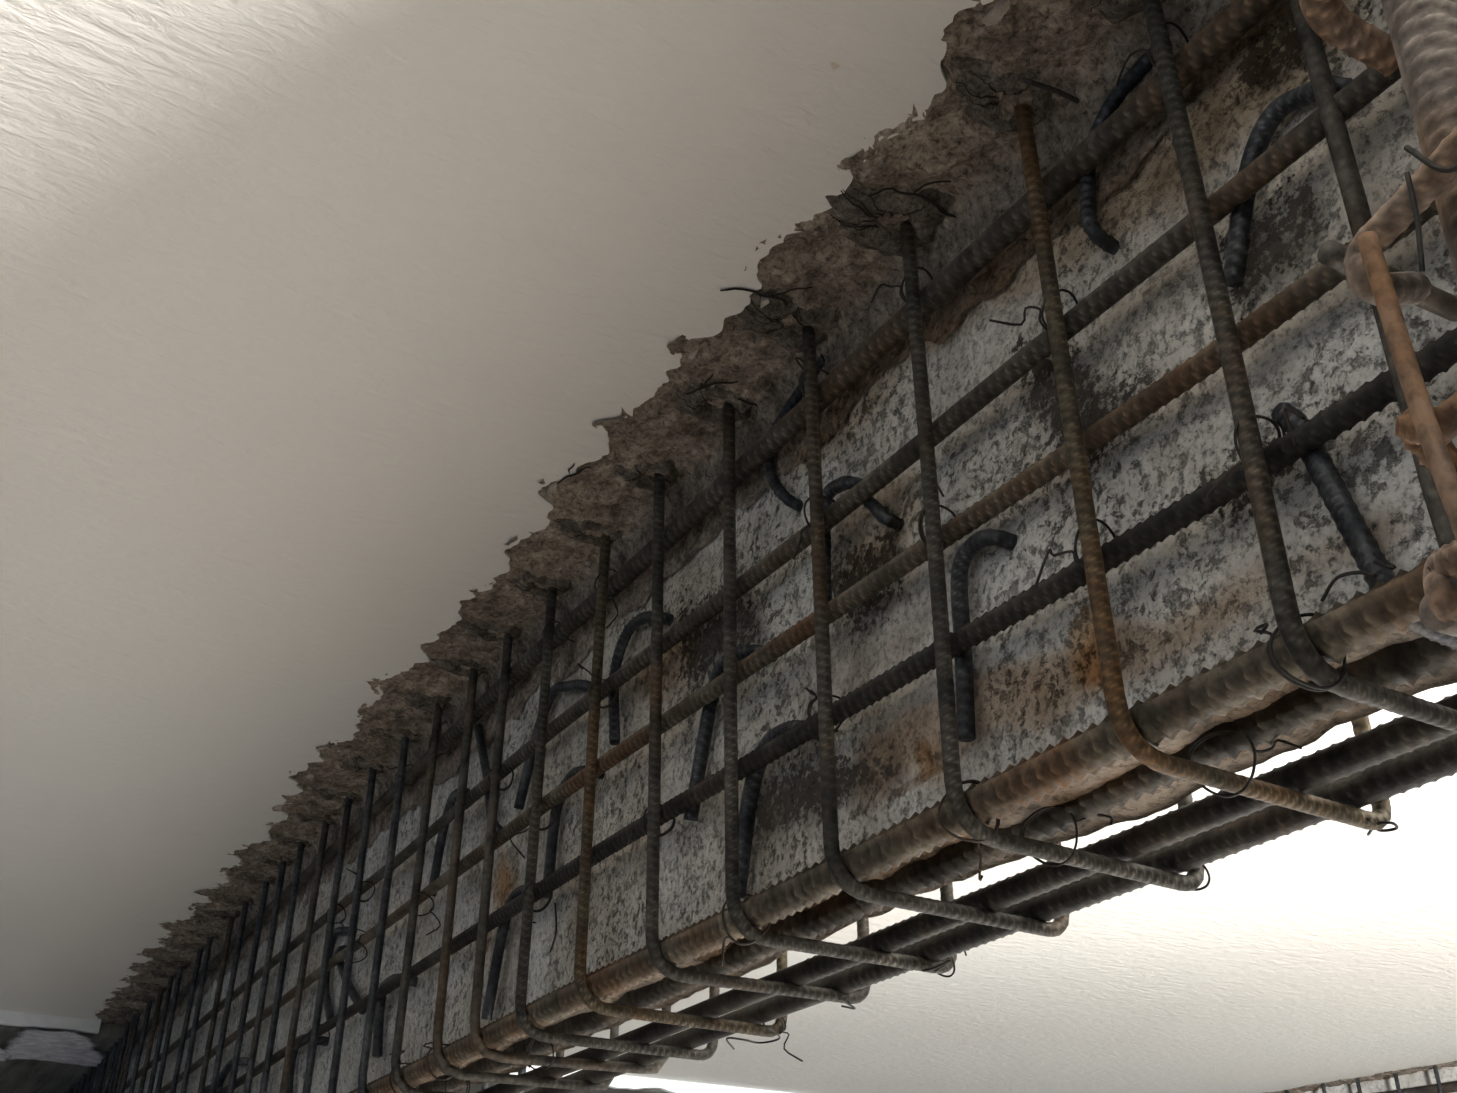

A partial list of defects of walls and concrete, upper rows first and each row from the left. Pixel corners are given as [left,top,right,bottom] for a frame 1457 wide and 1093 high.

peeling [982,0,1010,26]
spalling [1220,10,1304,117]
spalling [1228,165,1321,322]
spalling [996,333,1031,354]
spalling [1017,345,1155,449]
spalling [831,504,902,599]
spalling [1194,448,1240,487]
spalling [1205,491,1253,529]
spalling [672,568,767,696]
spalling [841,579,911,654]
spalling [752,745,901,843]
peeling [0,1030,102,1067]